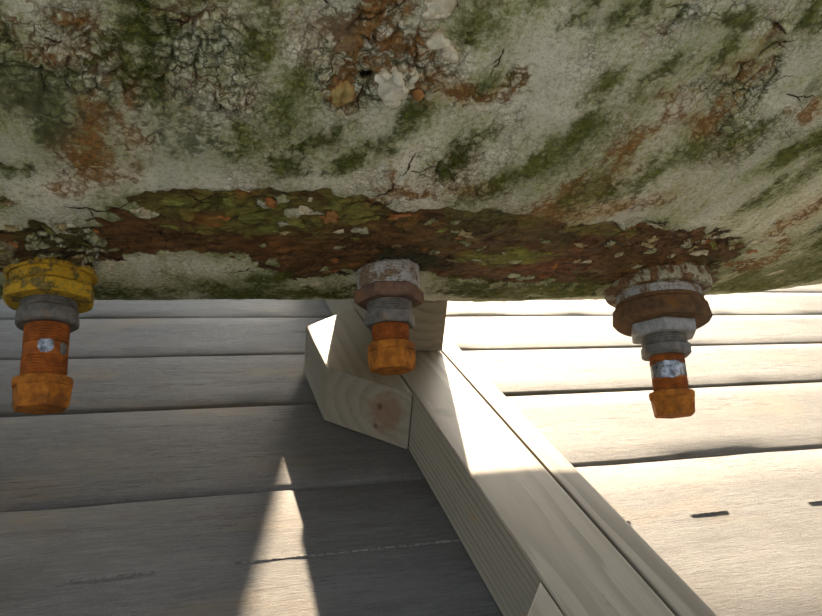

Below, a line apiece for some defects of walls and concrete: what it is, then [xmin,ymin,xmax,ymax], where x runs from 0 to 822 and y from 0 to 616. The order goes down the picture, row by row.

crack [170,16,191,29]
crack [759,22,796,56]
water stain [794,0,822,35]
rust [45,72,154,198]
water stain [134,83,263,161]
water stain [267,125,343,179]
crack [352,82,382,109]
rust [516,86,740,225]
crack [775,75,815,102]
rust [788,99,819,123]
peeling [0,187,789,286]
water stain [92,282,182,300]